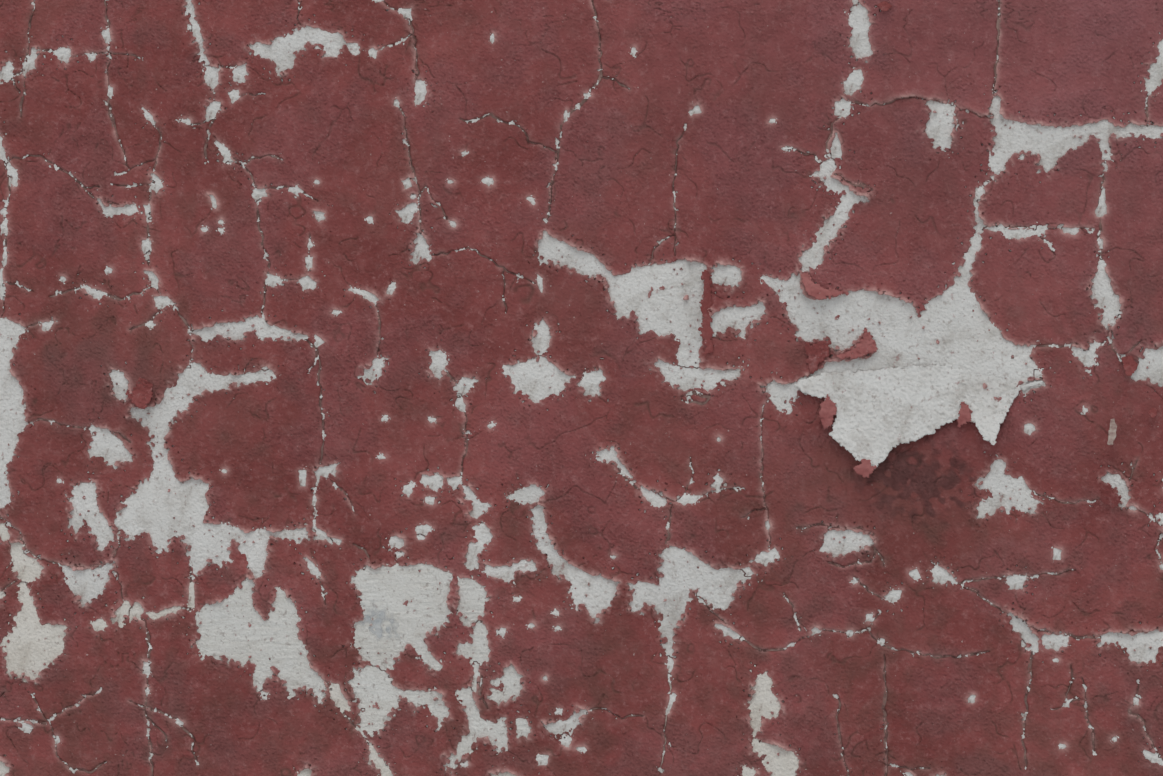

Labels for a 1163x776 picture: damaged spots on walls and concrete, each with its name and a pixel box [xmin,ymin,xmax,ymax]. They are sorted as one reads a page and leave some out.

peeling [249,14,378,81]
peeling [832,0,881,125]
crack [0,516,199,776]
crack [0,0,536,392]
crack [295,335,370,605]
peeling [0,307,783,776]
crack [419,347,478,476]
peeling [736,663,806,776]
peeling [533,84,1163,526]
crack [618,400,1133,776]
crack [974,161,1107,260]
peeling [1093,622,1163,671]